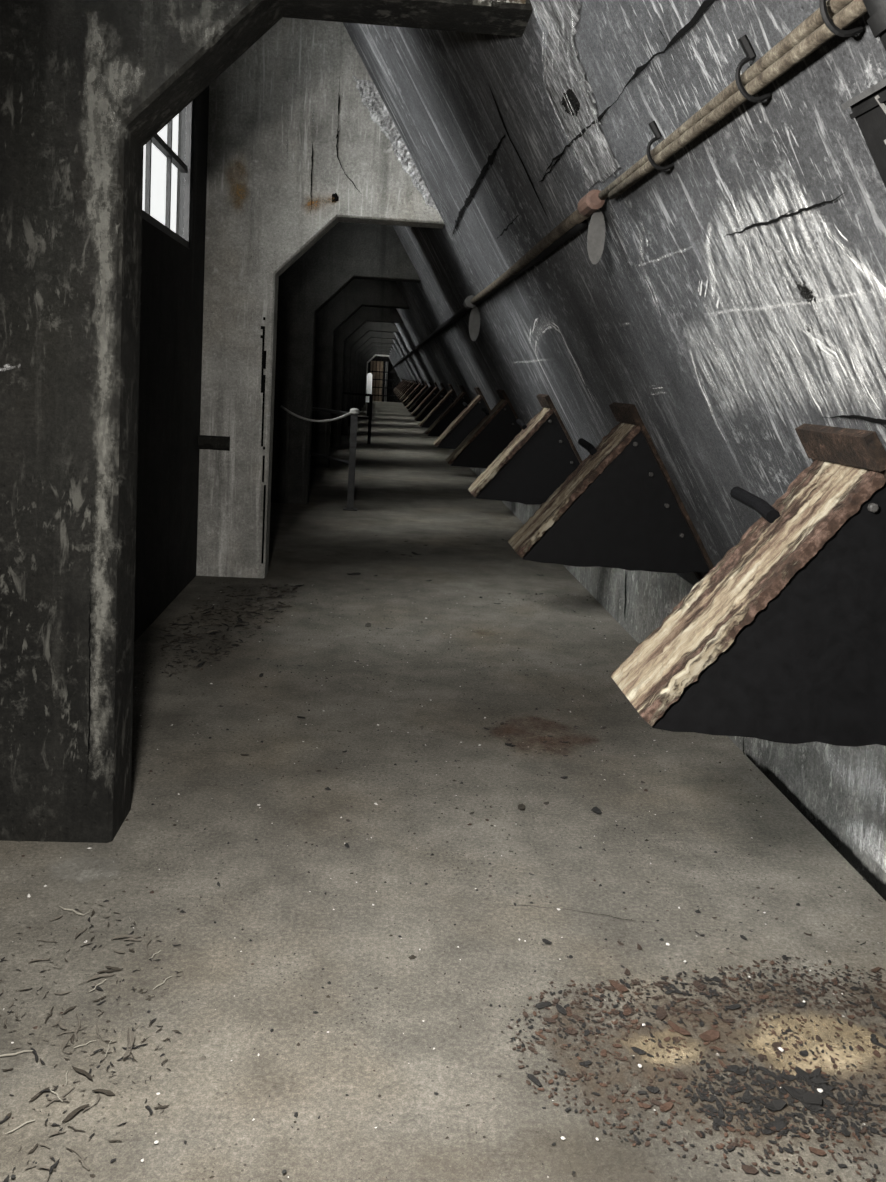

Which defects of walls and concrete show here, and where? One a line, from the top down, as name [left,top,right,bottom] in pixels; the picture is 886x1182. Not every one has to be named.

damp [531,0,620,190]
crack [539,0,714,182]
crack [452,135,505,236]
crack [821,415,886,428]
damp [746,754,886,901]